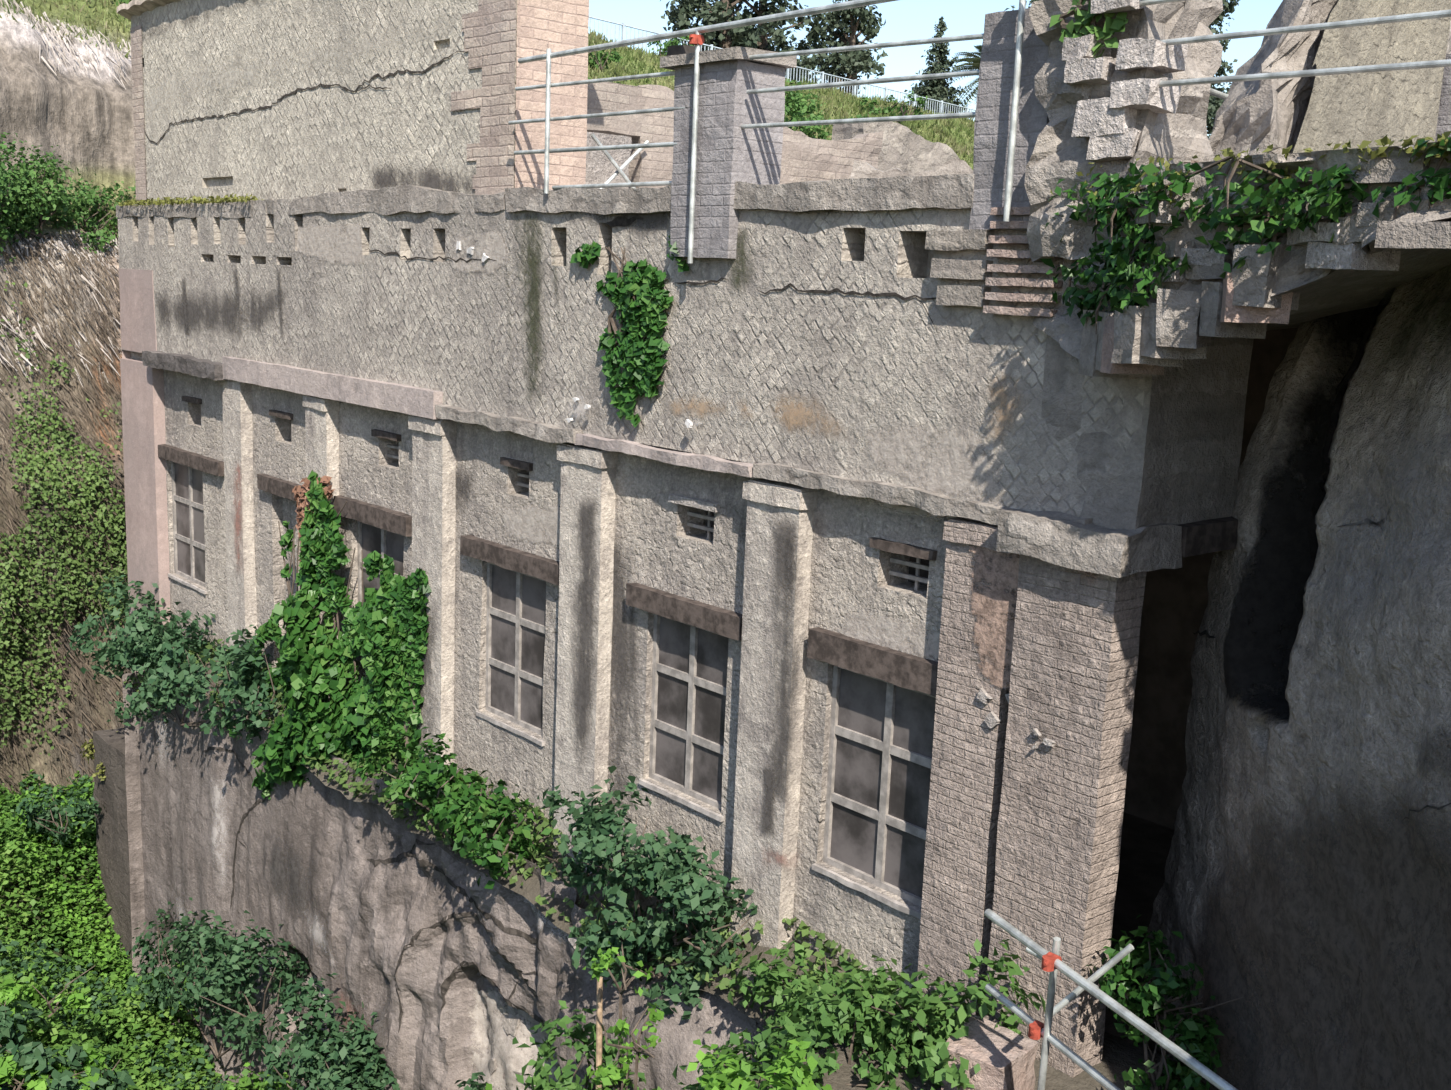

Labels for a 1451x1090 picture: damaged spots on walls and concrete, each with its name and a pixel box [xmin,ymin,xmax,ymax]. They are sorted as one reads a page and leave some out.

crack [144,51,464,144]
damp [158,271,282,333]
crack [678,278,937,331]
damp [574,503,634,791]
damp [762,524,799,832]
crack [203,747,271,908]
crack [367,839,544,1033]